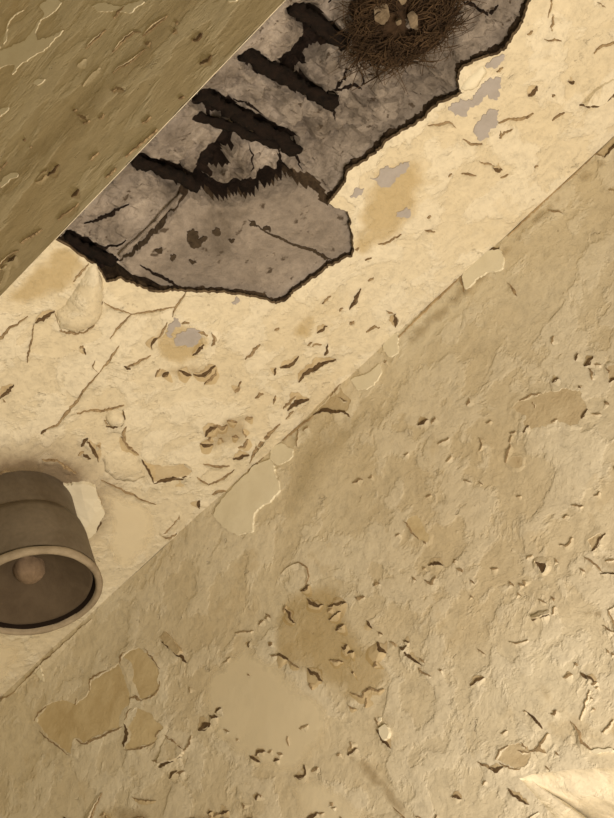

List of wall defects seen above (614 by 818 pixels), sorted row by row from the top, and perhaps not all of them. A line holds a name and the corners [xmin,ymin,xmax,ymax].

peeling [0,0,64,75]
spalling [54,0,534,305]
crack [73,263,89,282]
crack [0,316,29,345]
crack [41,291,188,438]
peeling [145,317,224,385]
peeling [255,310,407,425]
peeling [77,405,253,493]
peeling [504,375,609,472]
peeling [42,458,111,539]
peeling [363,621,444,679]
peeling [30,632,240,783]